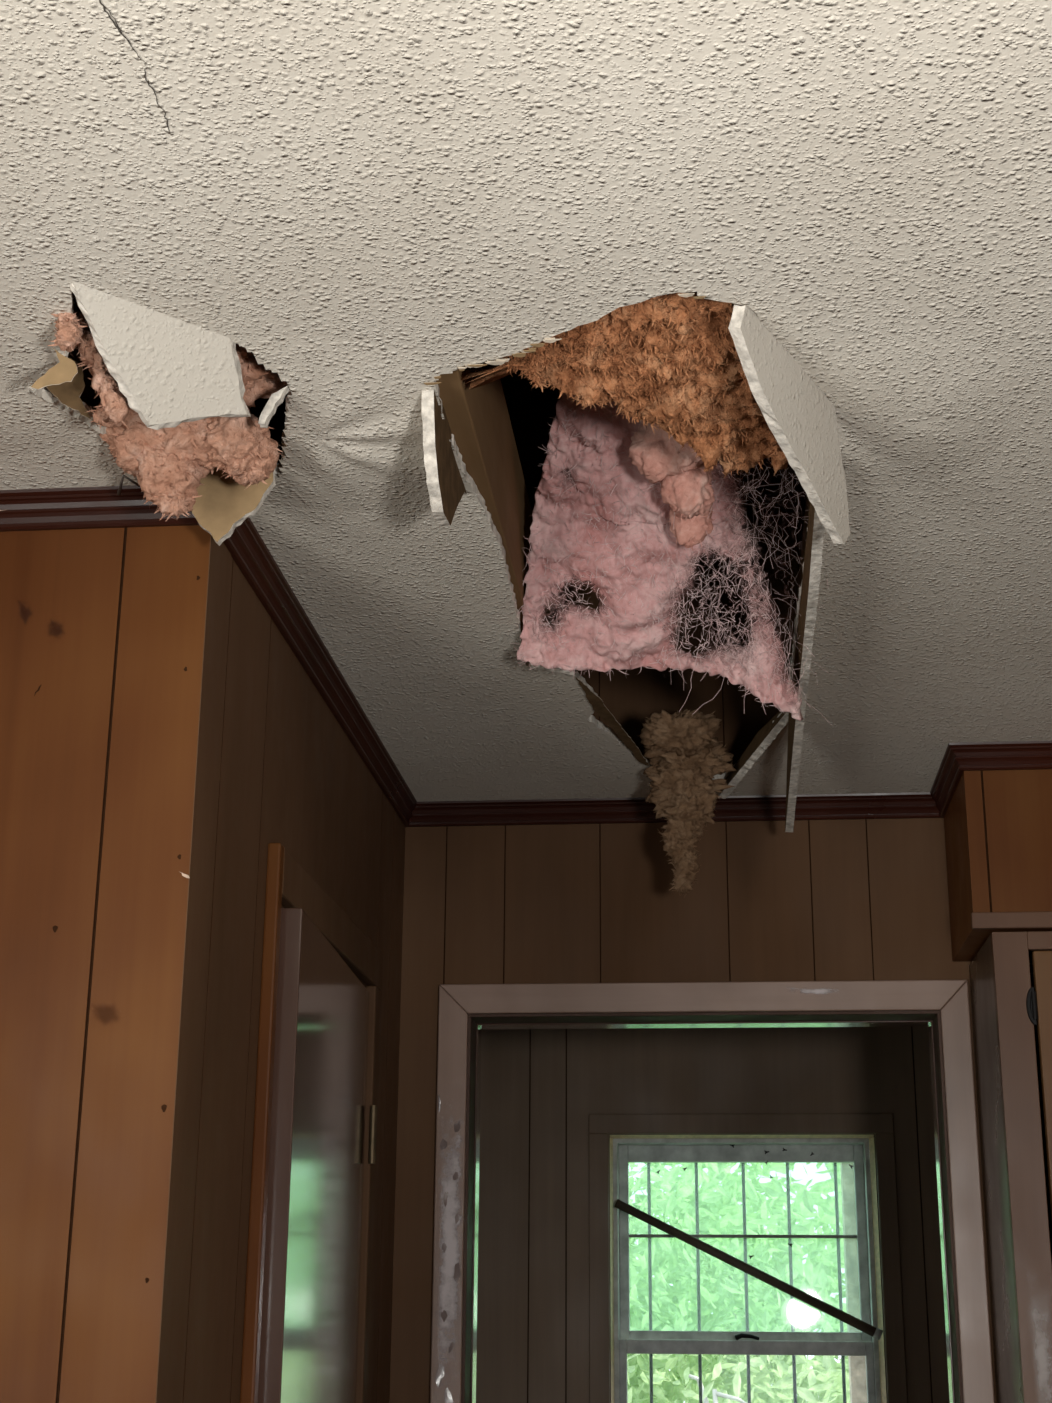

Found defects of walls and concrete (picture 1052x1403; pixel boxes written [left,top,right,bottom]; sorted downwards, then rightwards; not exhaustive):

crack [99,0,170,133]
spalling [258,386,290,428]